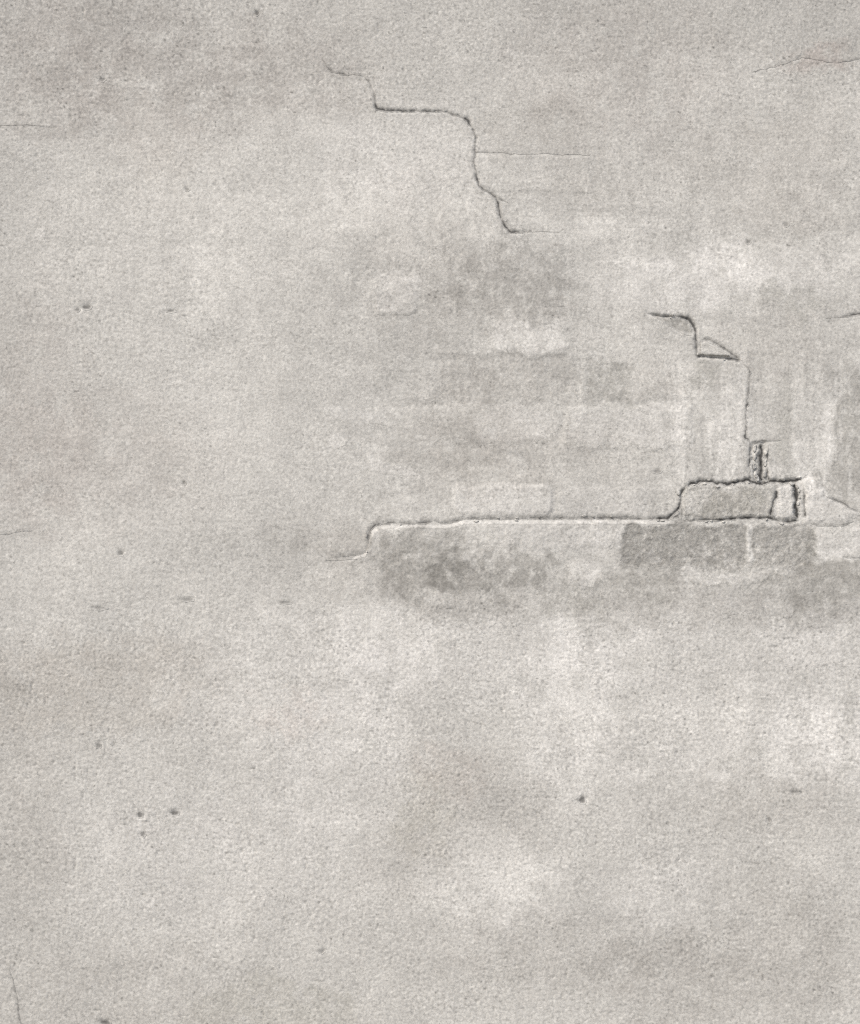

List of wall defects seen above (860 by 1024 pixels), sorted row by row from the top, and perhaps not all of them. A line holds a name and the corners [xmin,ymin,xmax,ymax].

crack [322,58,590,234]
peeling [487,312,571,360]
peeling [470,400,692,452]
leakage [365,514,860,639]